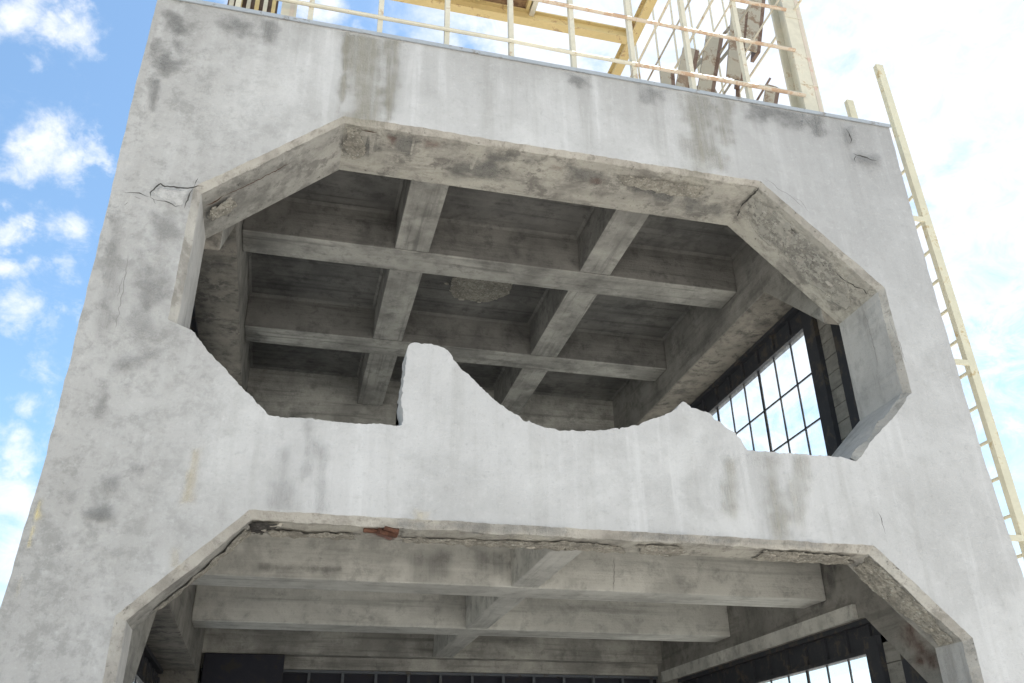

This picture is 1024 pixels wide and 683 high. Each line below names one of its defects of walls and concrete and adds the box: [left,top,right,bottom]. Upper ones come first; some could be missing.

crack [125,164,288,208]
spalling [209,197,238,221]
peeling [740,197,851,309]
spalling [445,277,513,303]
rust [363,526,399,541]
spalling [399,536,686,557]
spalling [752,550,954,646]